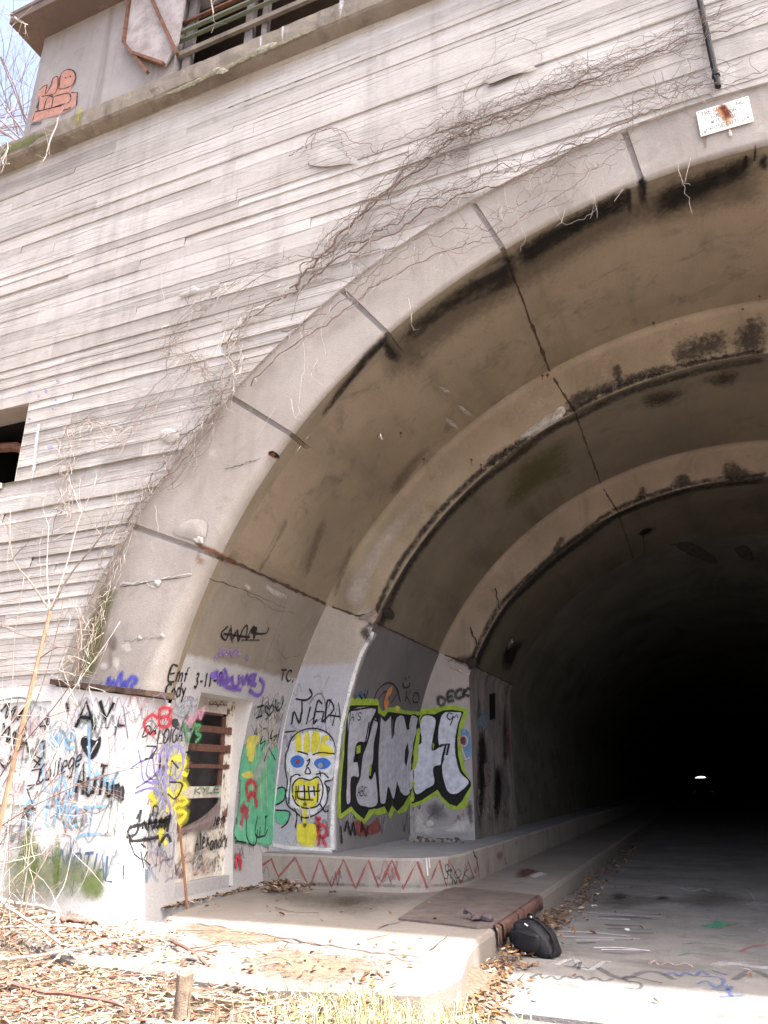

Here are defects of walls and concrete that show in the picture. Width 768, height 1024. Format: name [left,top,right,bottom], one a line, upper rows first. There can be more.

water stain [408,177,646,337]
water stain [323,338,398,414]
water stain [369,319,766,627]
corrosion [196,543,237,565]